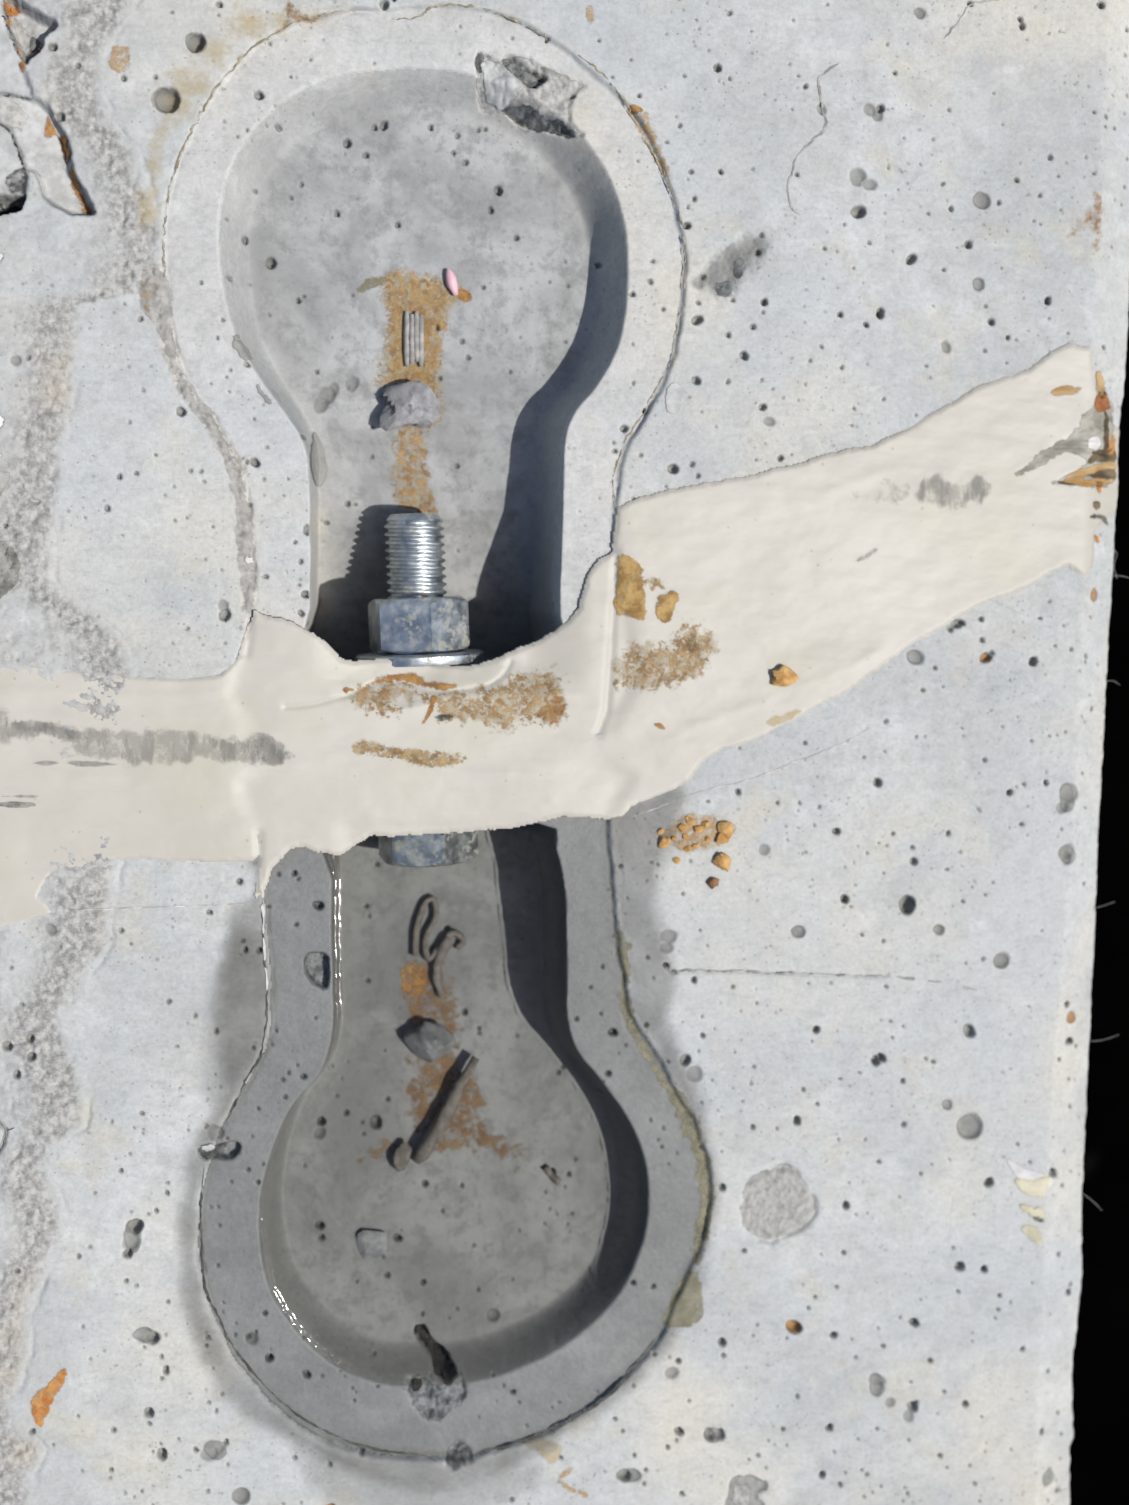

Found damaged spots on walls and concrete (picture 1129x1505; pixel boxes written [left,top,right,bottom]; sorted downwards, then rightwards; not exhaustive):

spalling [0,0,94,215]
spalling [475,54,584,139]
corrosion [357,271,471,402]
corrosion [391,421,440,513]
spalling [1015,371,1117,525]
corrosion [343,673,566,729]
corrosion [352,741,466,768]
corrosion [401,961,518,1157]
corrosion [31,1369,67,1427]